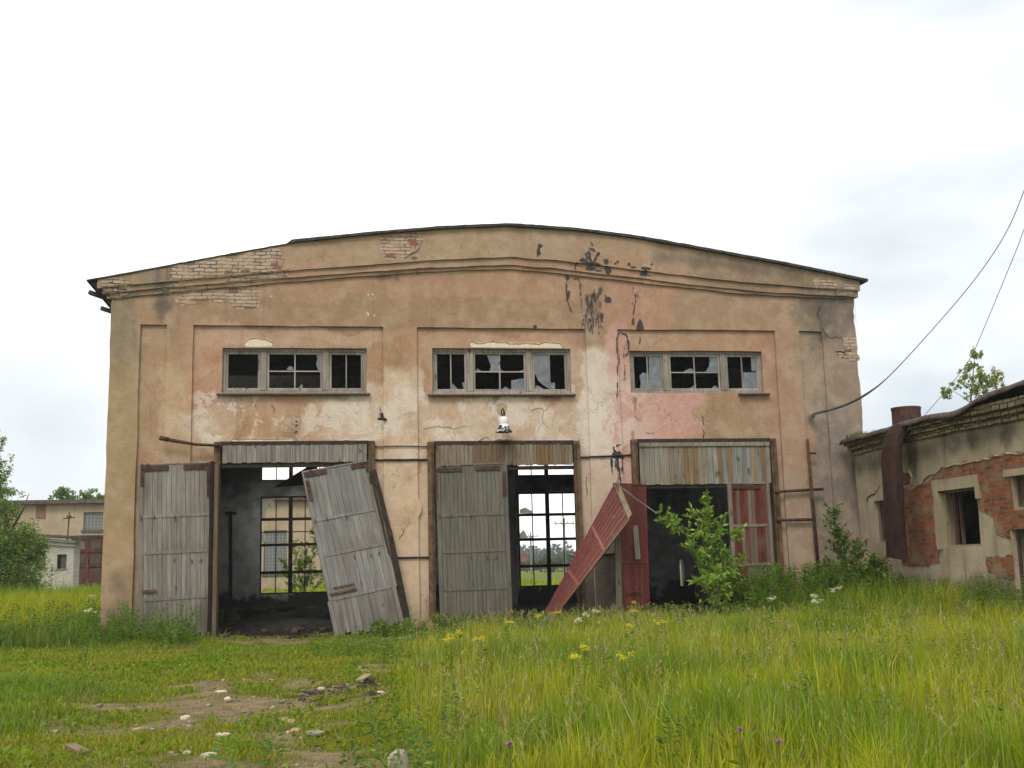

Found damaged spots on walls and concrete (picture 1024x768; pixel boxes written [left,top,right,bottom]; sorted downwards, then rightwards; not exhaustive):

spalling [379,232,423,260]
spalling [161,246,289,310]
water stain [582,287,603,339]
flaking render [468,340,563,348]
spalling [836,337,860,361]
flaking render [229,417,302,441]
spalling [902,451,1024,566]
spalling [986,554,1014,580]